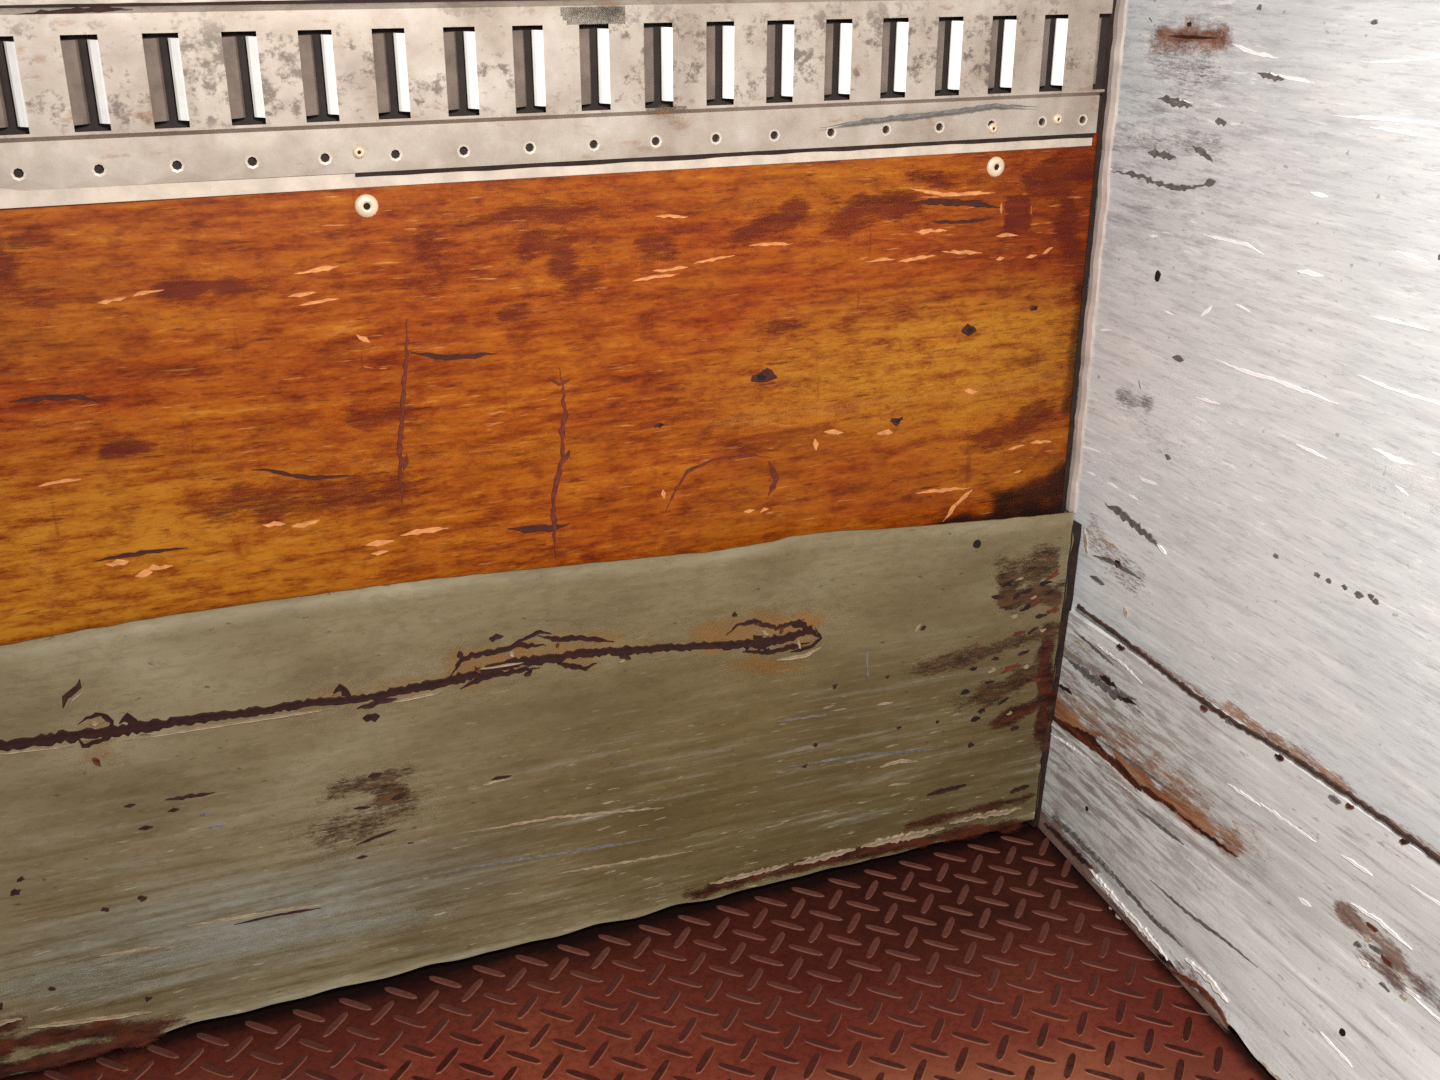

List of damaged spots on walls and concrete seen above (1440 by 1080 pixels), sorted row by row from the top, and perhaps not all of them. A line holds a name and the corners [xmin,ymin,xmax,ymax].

corrosion [1153,21,1232,76]
crack [508,367,570,560]
crack [0,612,822,766]
peeling [1335,901,1427,1001]